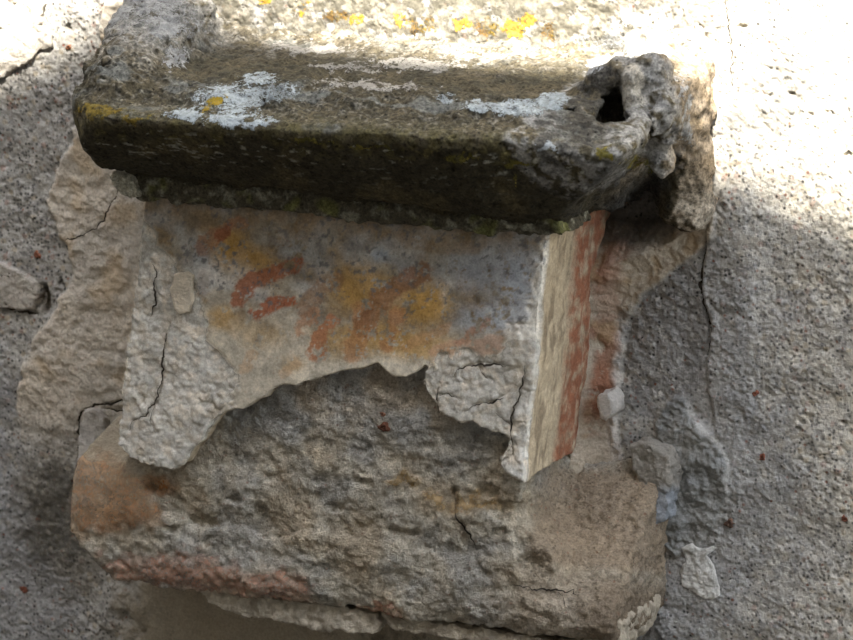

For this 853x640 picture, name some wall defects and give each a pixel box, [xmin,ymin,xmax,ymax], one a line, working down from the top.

crack [725,0,734,103]
crack [698,237,712,352]
spalling [377,412,390,432]
spalling [424,341,540,483]